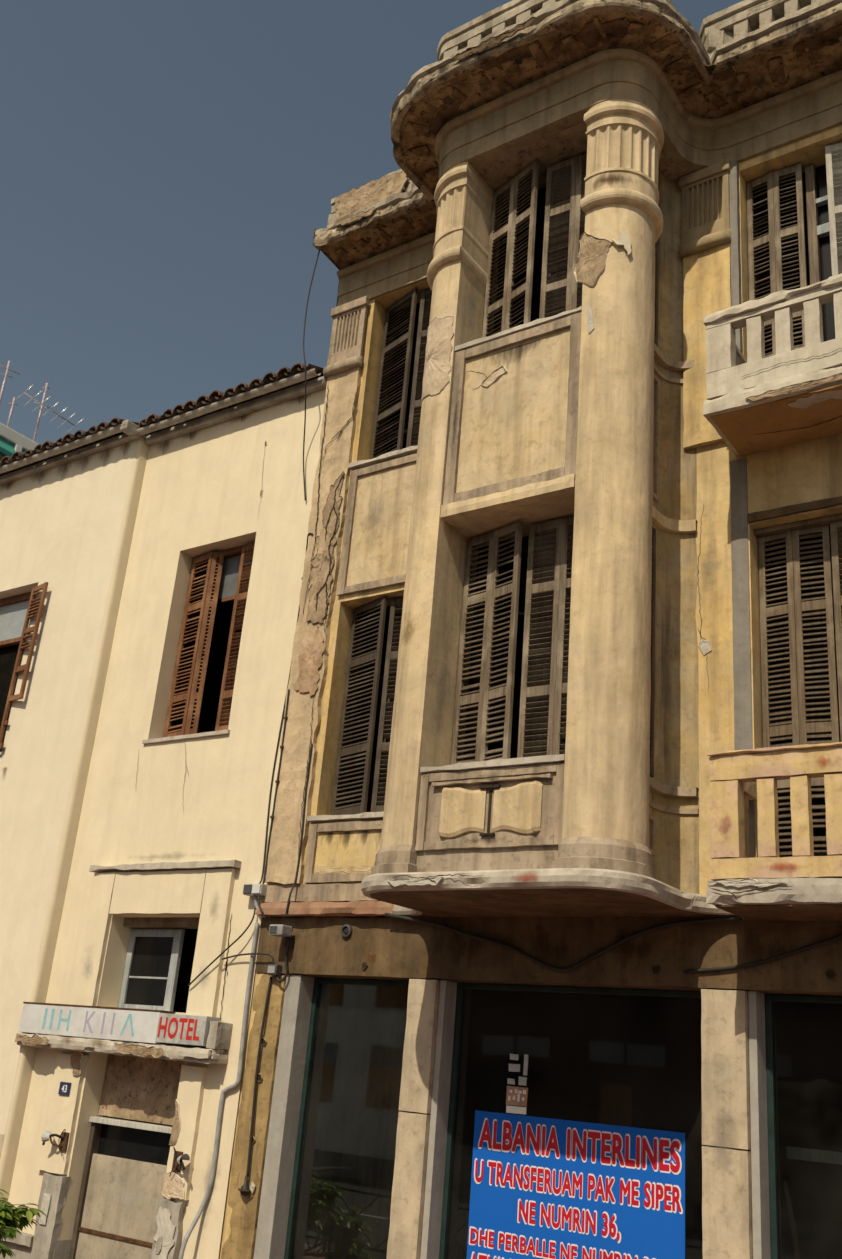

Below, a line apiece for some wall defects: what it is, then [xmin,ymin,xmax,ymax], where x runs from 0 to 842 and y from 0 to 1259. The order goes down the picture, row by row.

peeling [574,231,631,287]
crack [303,383,356,634]
peeling [151,1171,184,1259]